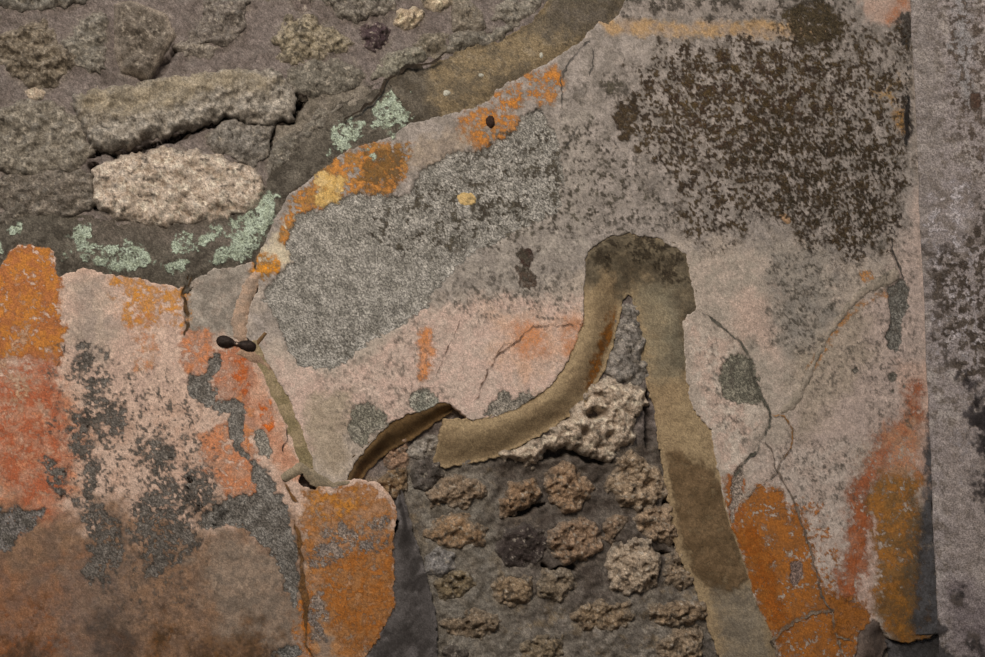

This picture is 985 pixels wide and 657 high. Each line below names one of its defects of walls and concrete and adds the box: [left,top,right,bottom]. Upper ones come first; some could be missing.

spalling [262,108,565,370]
peeling [0,325,30,405]
spalling [409,388,439,412]
spalling [483,390,534,417]
crack [704,314,854,657]